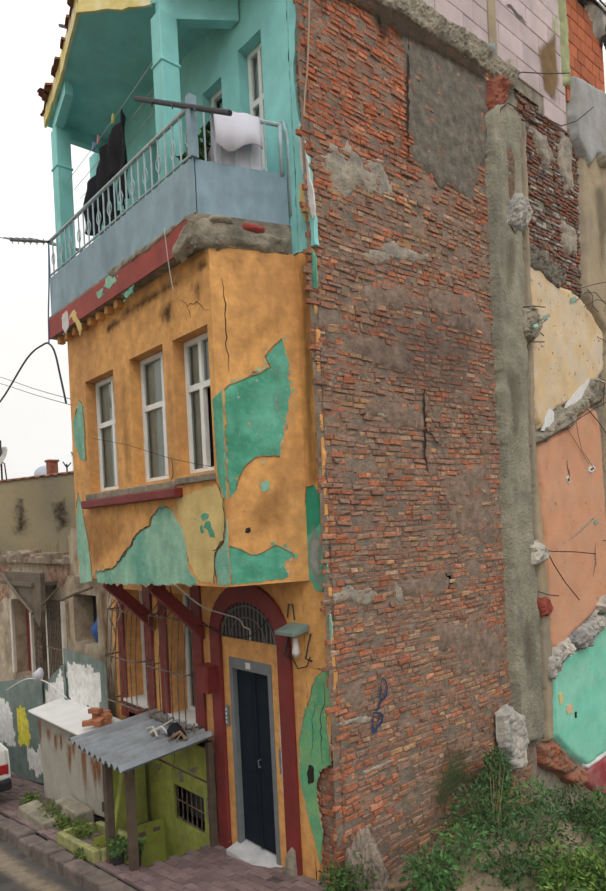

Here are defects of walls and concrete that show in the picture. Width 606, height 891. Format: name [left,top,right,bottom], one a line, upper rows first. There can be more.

spalling [506,145,534,234]
spalling [96,214,290,299]
spalling [523,243,606,312]
crack [181,277,229,368]
spalling [522,305,547,344]
peeling [46,337,329,592]
crack [423,389,440,471]
rust [38,720,100,781]
peeling [298,671,334,865]